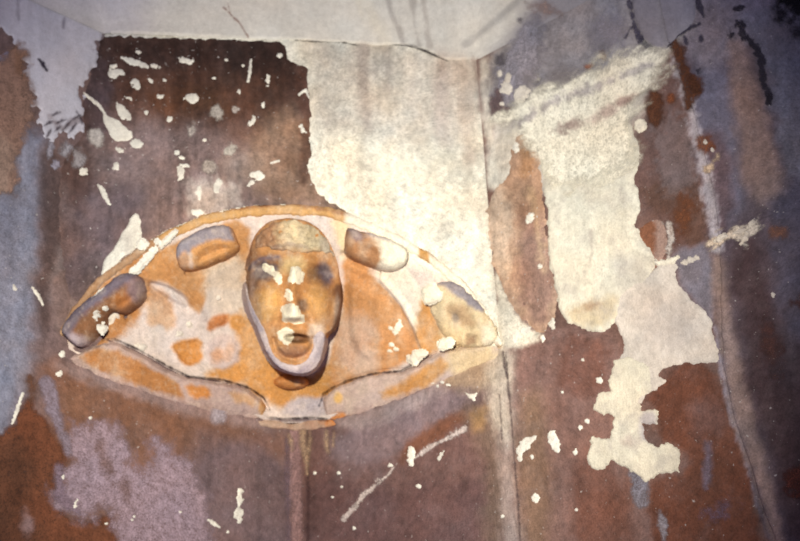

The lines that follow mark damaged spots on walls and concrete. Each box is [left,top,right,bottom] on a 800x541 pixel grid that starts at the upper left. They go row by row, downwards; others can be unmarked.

corrosion [644,39,702,127]
peeling [0,0,345,301]
corrosion [697,136,715,153]
peeling [485,45,721,482]
peeling [420,283,443,305]
peeling [92,306,120,335]
peeling [387,319,456,366]
peeling [11,392,24,425]
leakage [211,409,226,423]
corrosion [0,374,116,541]
leakage [39,377,212,541]